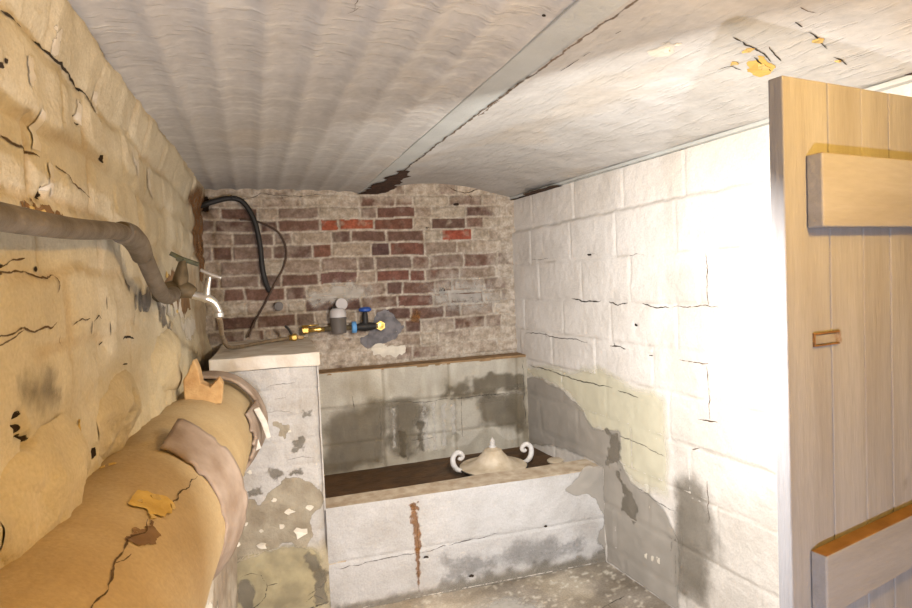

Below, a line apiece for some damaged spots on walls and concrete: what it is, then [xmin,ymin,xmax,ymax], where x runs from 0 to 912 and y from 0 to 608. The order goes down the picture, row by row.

crack [1,10,94,109]
flaking render [730,48,776,77]
crack [0,315,135,346]
peeling [273,421,291,439]
water stain [324,400,425,474]
peeling [237,477,324,562]
corrosion [410,501,422,585]
water stain [445,370,712,608]